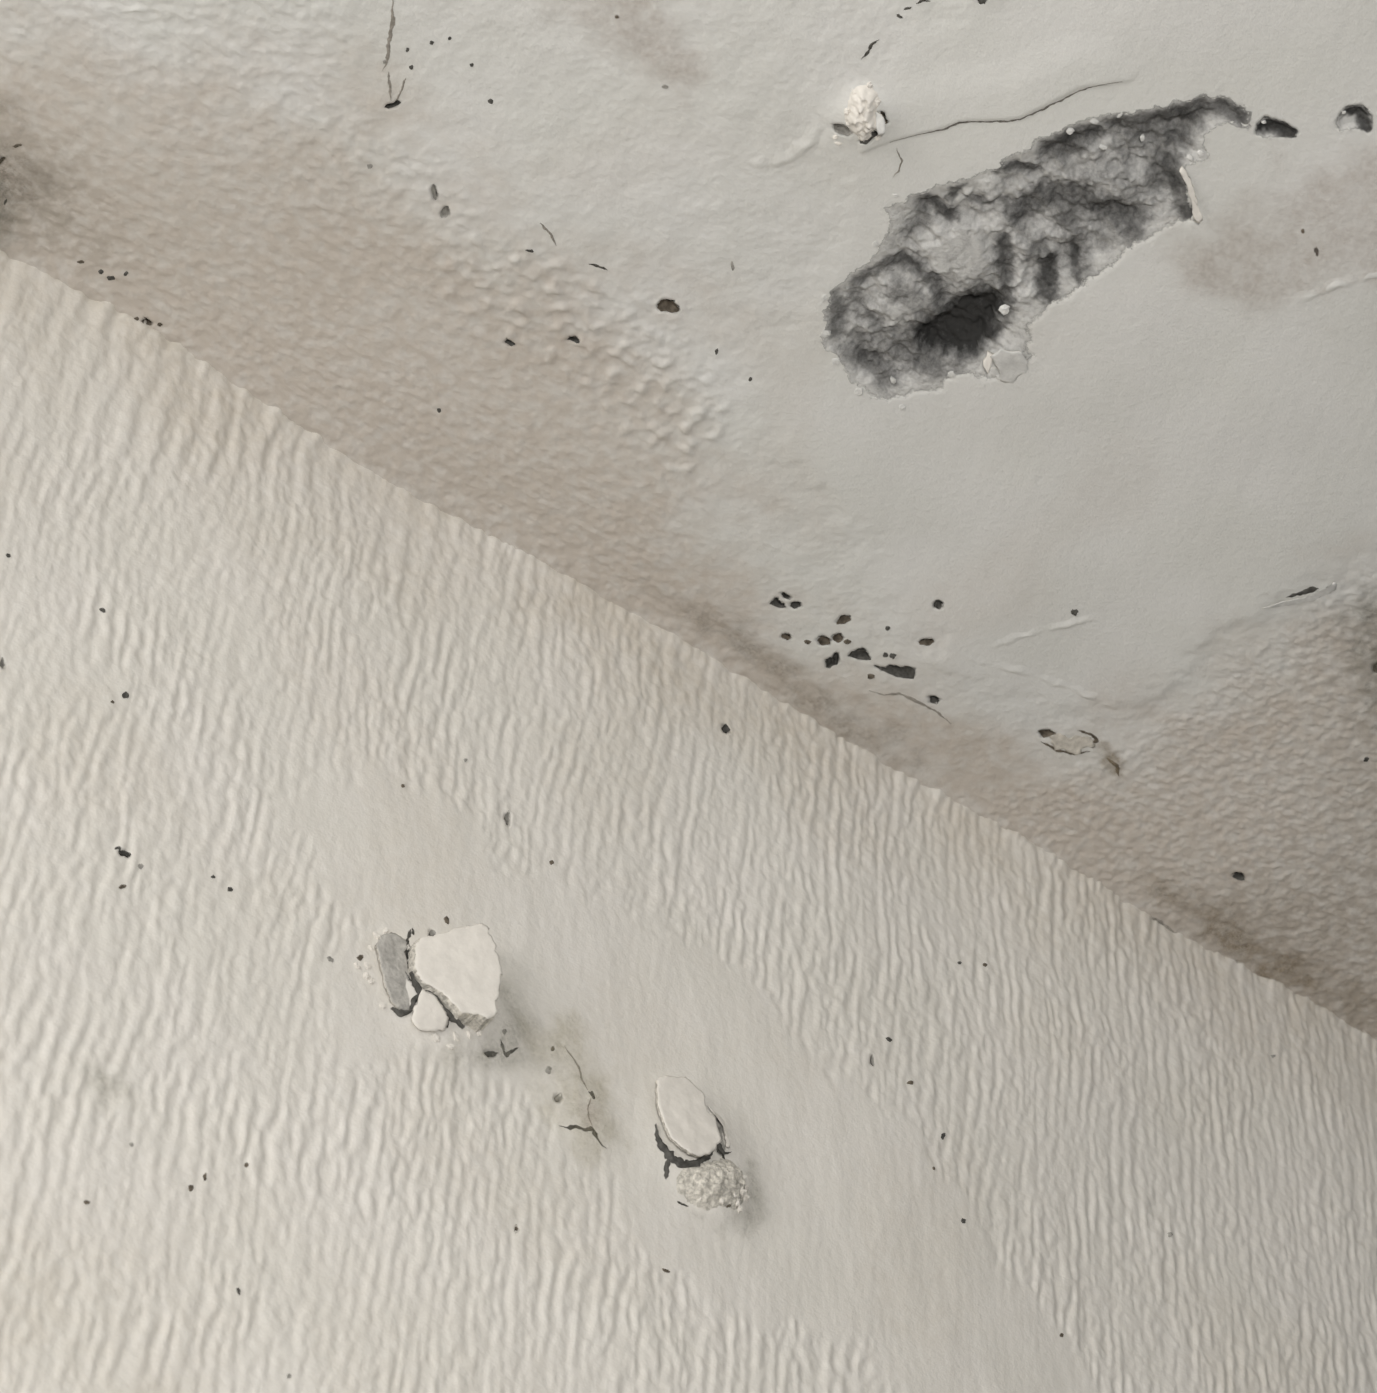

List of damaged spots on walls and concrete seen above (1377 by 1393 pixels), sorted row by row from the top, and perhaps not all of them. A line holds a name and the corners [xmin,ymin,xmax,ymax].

spalling [1336,105,1372,133]
spalling [820,81,1298,410]
spalling [770,592,801,609]
spalling [781,615,915,679]
crack [545,1046,607,1149]